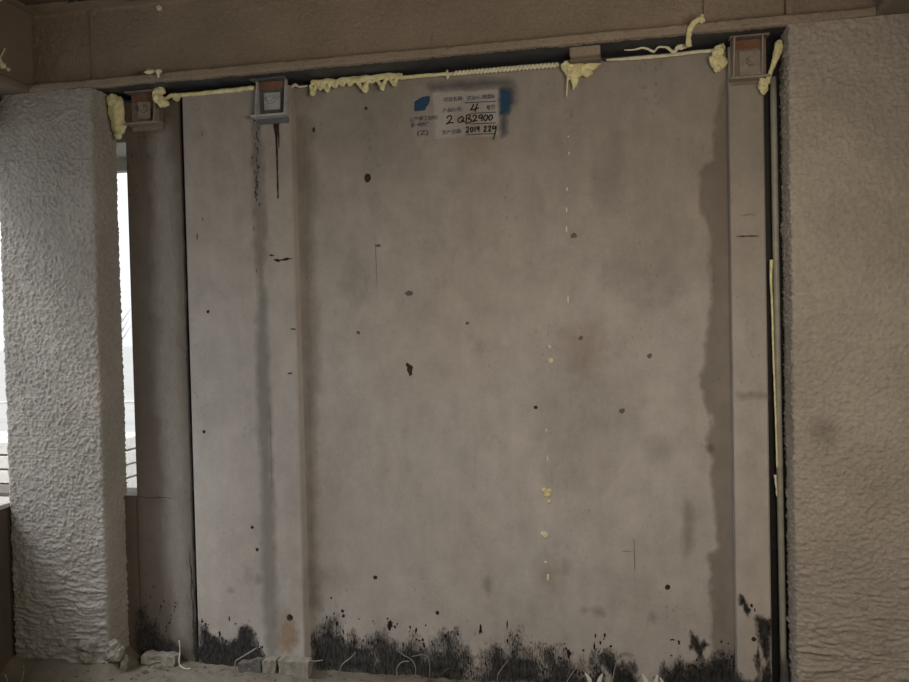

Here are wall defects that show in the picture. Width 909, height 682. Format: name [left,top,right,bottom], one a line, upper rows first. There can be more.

damp [136,600,183,658]
damp [193,617,265,666]
damp [311,613,637,682]
damp [658,594,773,682]